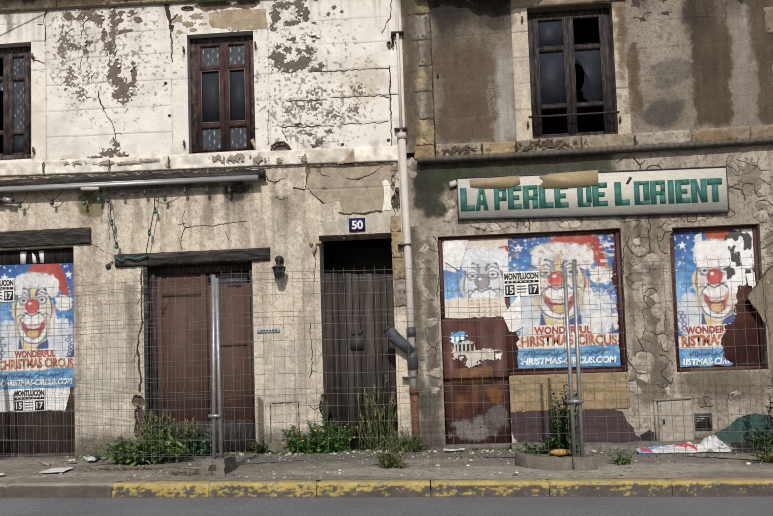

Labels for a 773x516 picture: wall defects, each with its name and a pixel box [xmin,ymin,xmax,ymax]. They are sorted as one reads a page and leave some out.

peeling [55,7,143,106]
crack [0,0,398,252]
peeling [171,0,324,75]
leakage [402,0,515,143]
leakage [618,8,679,125]
leakage [683,0,773,141]
crack [135,268,144,392]
peeling [417,236,443,394]
peeling [725,156,773,373]